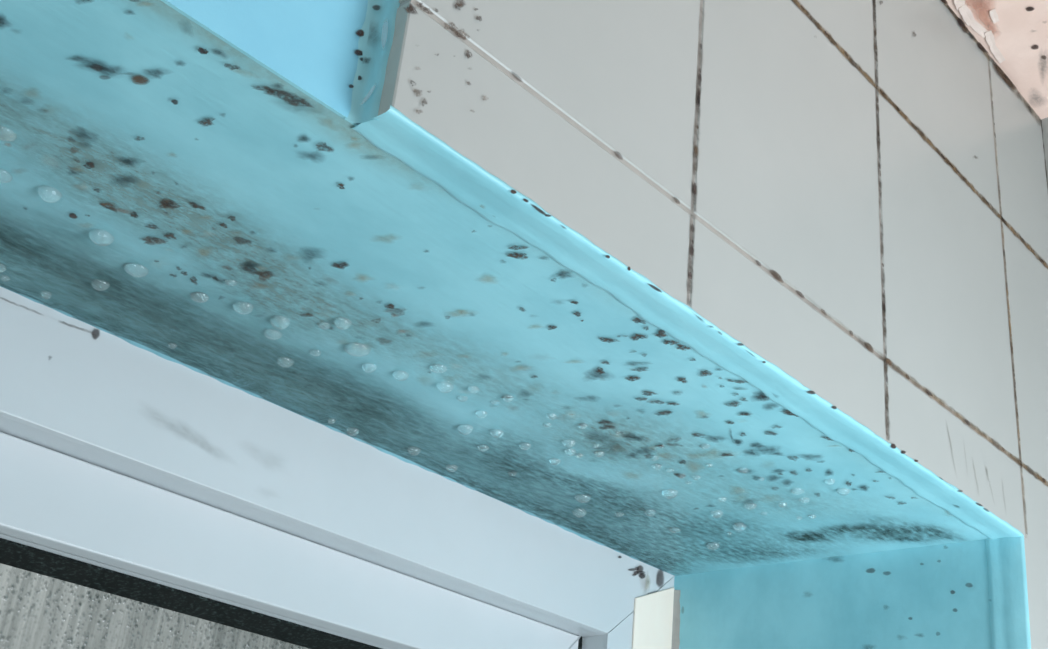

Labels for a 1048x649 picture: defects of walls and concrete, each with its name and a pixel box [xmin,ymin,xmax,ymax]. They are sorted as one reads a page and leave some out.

leakage [73,57,117,79]
leakage [132,71,162,84]
leakage [256,85,309,106]
leakage [692,69,701,204]
leakage [0,104,344,329]
leakage [507,246,528,259]
leakage [792,0,1048,486]
leakage [0,222,416,440]
leakage [578,418,663,458]
leakage [599,318,812,484]
leakage [540,509,722,594]
leakage [792,526,951,541]